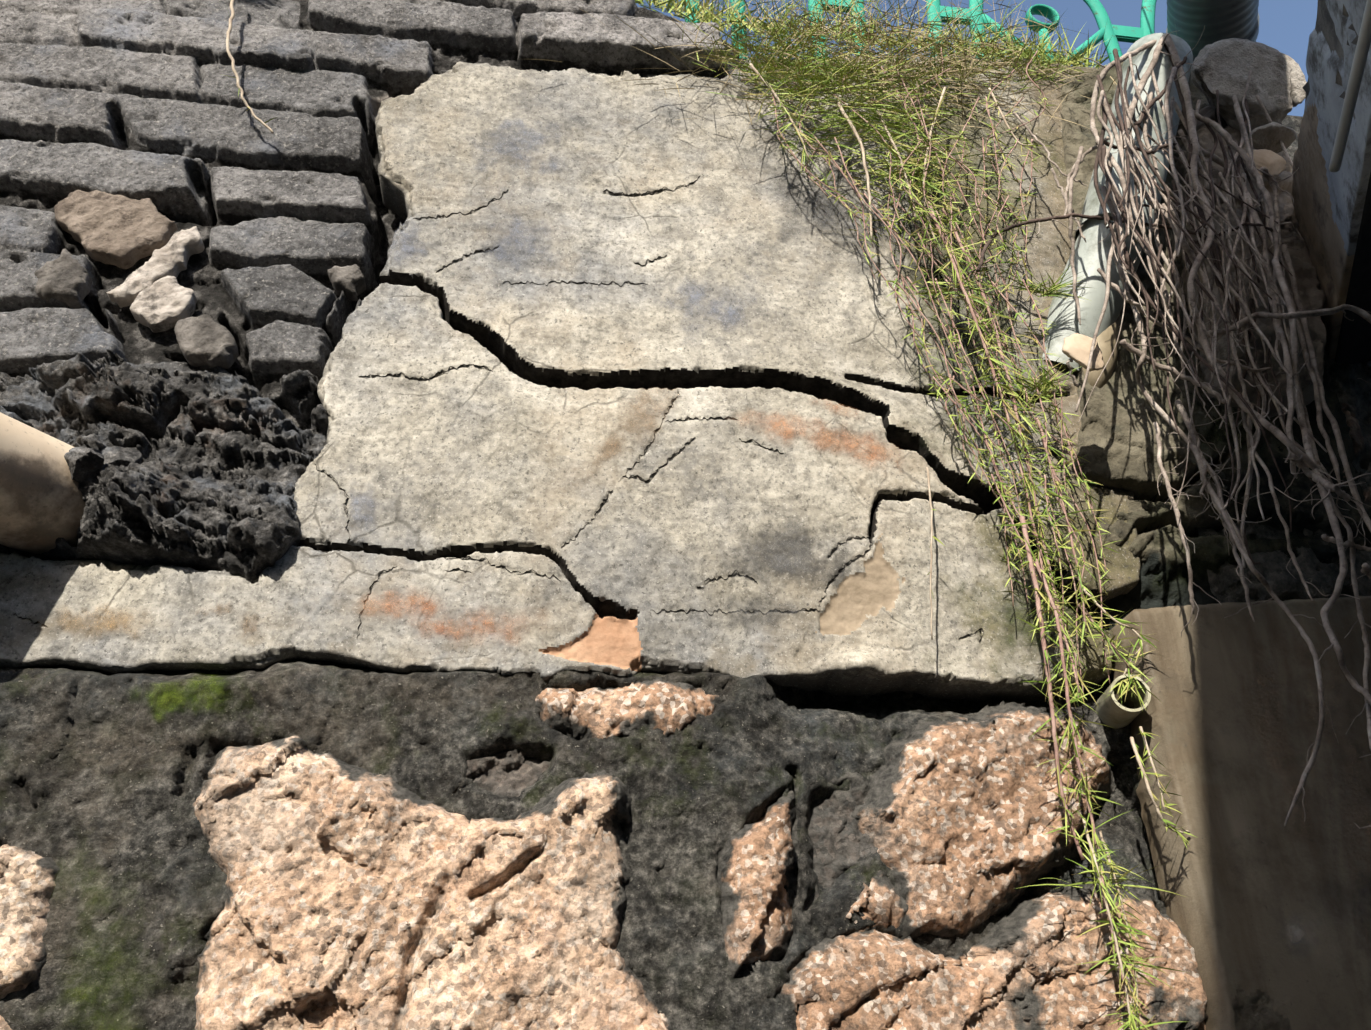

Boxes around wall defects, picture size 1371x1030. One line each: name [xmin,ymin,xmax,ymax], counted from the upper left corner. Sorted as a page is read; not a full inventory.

crack [413,191,507,219]
spalling [328,264,366,301]
crack [957,220,990,316]
spalling [0,190,328,583]
crack [297,247,1106,636]
crack [1049,445,1216,535]